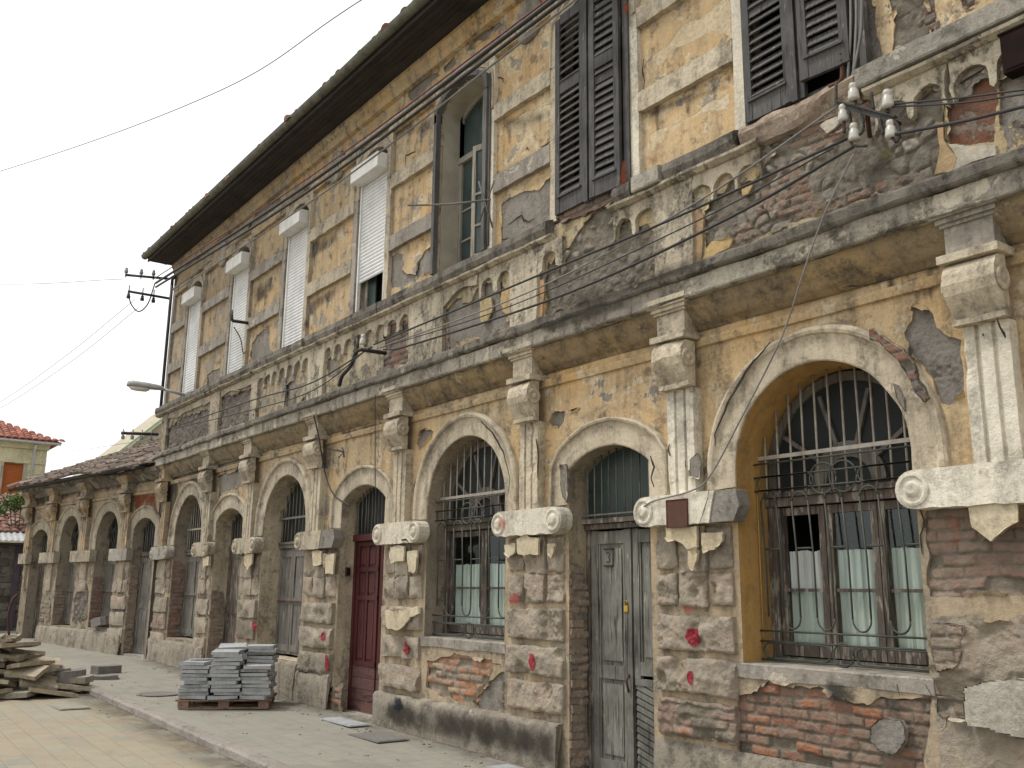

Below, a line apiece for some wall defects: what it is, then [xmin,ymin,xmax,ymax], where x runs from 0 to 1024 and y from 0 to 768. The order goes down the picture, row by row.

flaking render [693,68,1024,262]
peeling [391,245,430,288]
flaking render [502,175,655,317]
peeling [869,303,965,412]
flaking render [926,503,1024,598]
flaking render [427,653,505,711]
flaking render [739,615,1024,768]